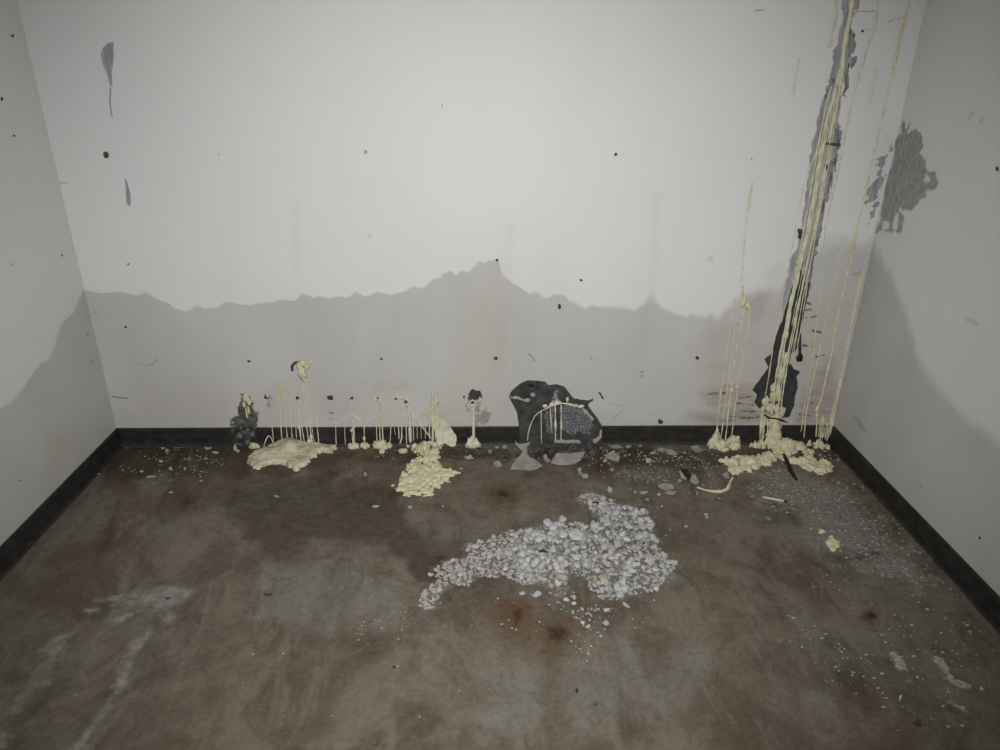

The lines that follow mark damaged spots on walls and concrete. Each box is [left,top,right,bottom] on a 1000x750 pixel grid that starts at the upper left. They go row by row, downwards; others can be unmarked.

peeling [100,41,115,118]
peeling [752,0,861,418]
peeling [863,116,943,239]
damp [0,181,802,546]
spalling [508,379,622,474]